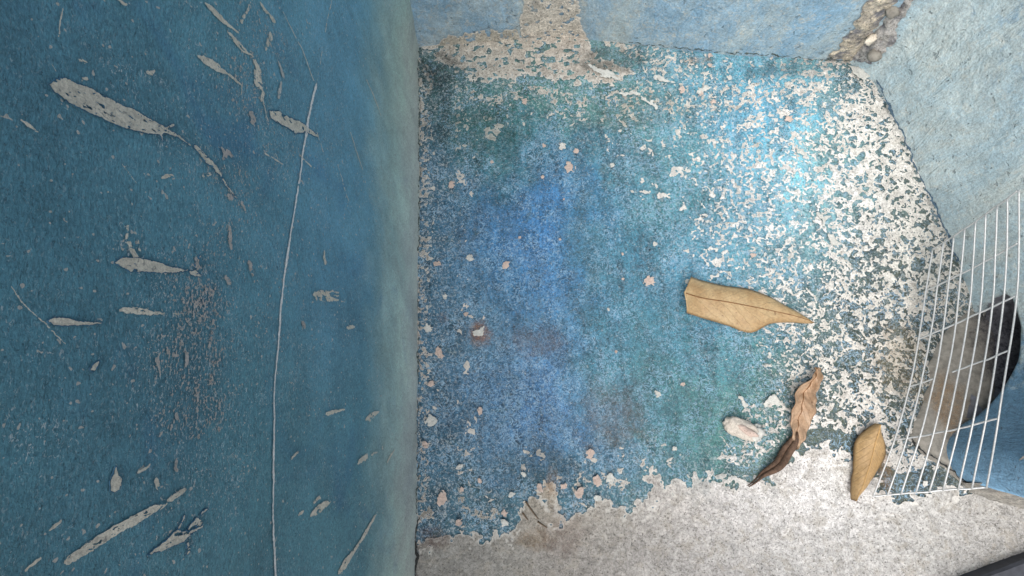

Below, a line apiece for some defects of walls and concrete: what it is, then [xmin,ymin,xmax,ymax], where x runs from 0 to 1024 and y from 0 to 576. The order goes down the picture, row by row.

peeling [38,316,103,344]
peeling [48,0,380,574]
peeling [416,0,1024,576]